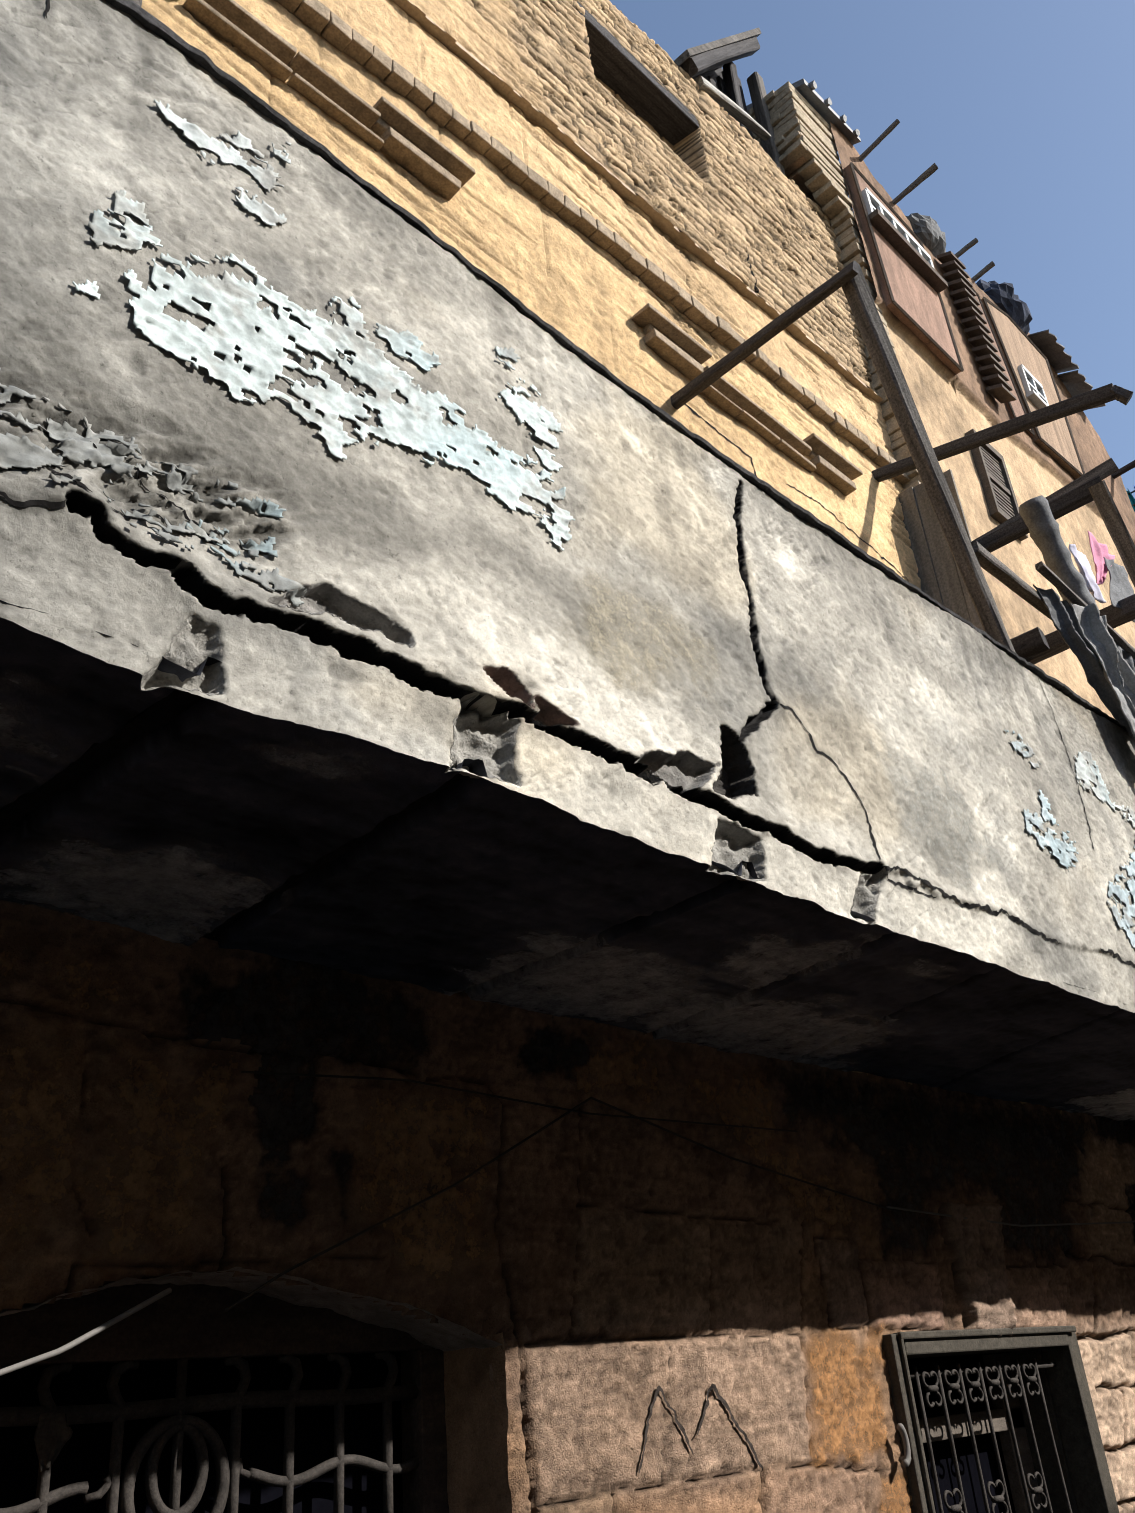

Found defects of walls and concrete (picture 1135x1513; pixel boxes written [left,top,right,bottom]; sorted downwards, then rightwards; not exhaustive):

crack [746,247,760,296]
peeling [88,189,575,551]
peeling [0,368,416,648]
crack [0,404,1061,944]
flaking render [635,725,759,799]
peeling [1024,790,1079,872]
crack [1036,673,1094,849]
peeling [1074,750,1135,828]
leakage [0,841,266,943]
crack [1100,948,1135,968]
leakage [444,932,1084,1263]
leakage [1051,1089,1135,1121]